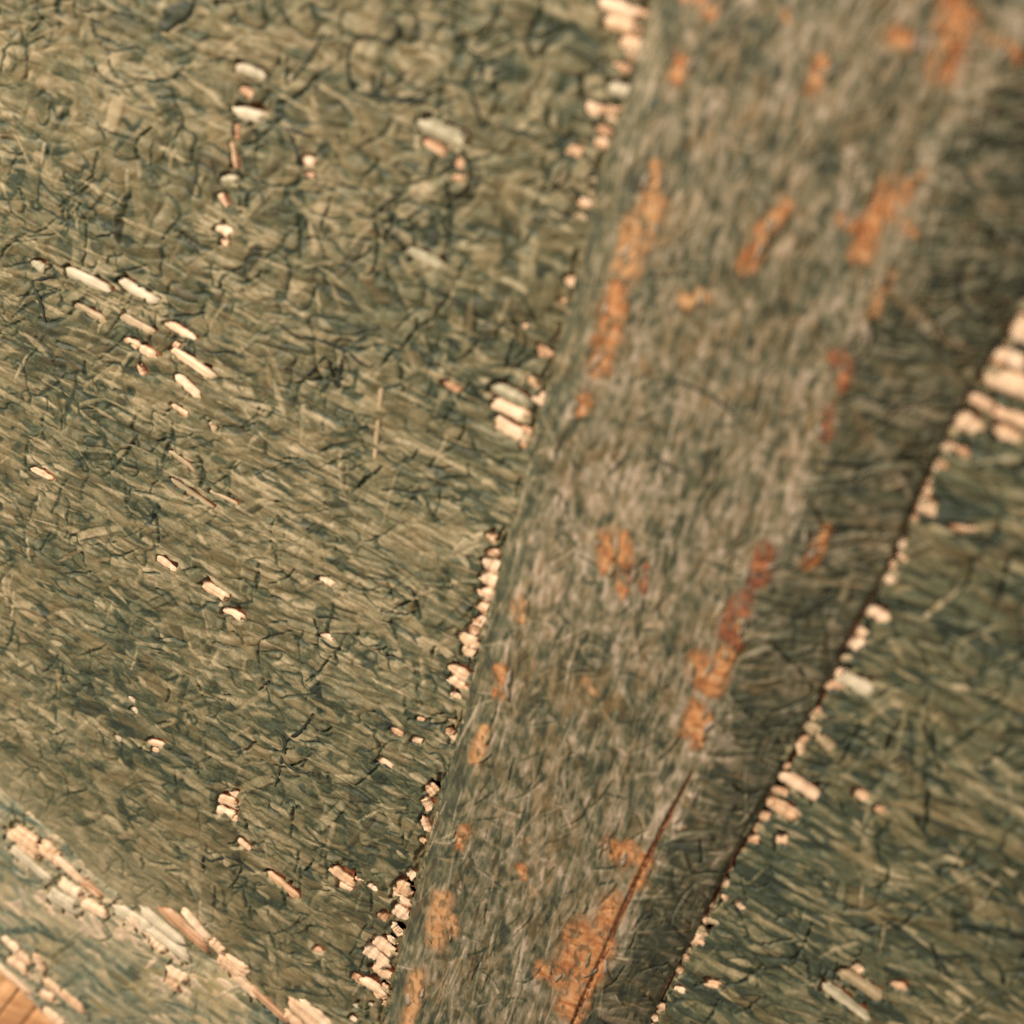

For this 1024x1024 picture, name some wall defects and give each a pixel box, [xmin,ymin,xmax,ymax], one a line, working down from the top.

crack [346,6,483,123]
peeling [120,311,217,417]
crack [277,322,374,389]
peeling [883,310,1024,584]
crack [313,615,343,649]
peeling [447,527,502,700]
rust [713,541,778,652]
crack [274,713,313,787]
peeling [0,825,331,1024]
peeling [350,866,419,1023]
crack [572,776,691,1024]
peeling [674,706,835,994]